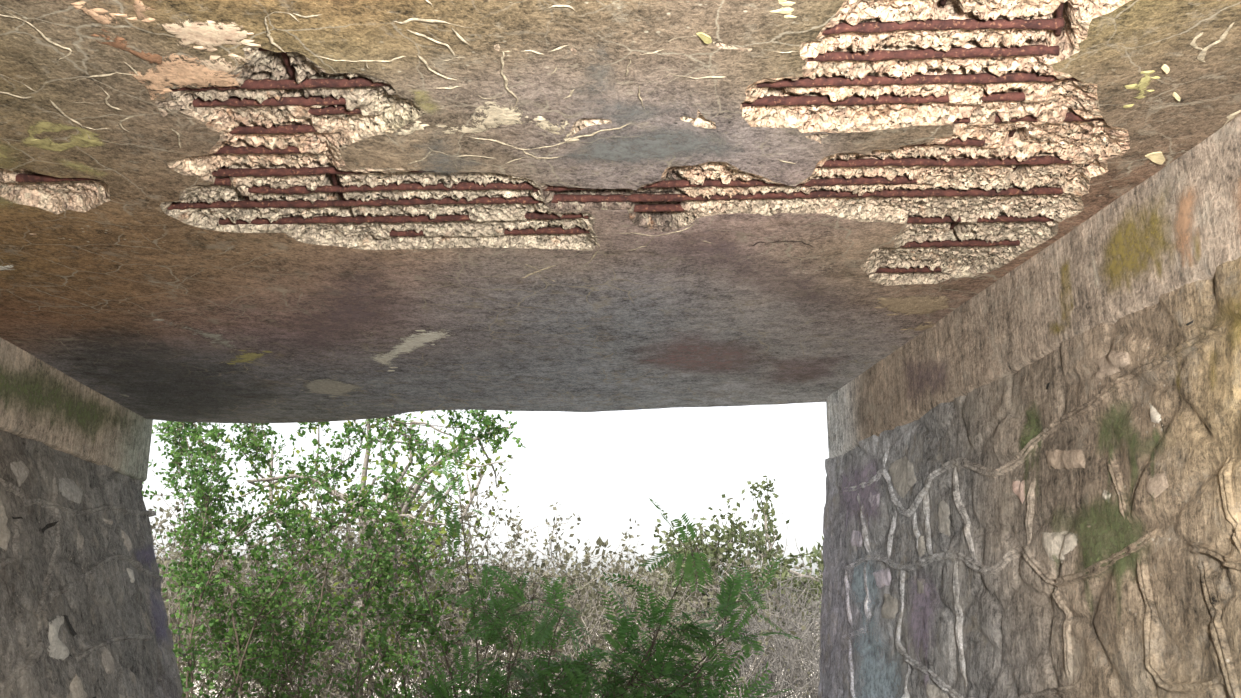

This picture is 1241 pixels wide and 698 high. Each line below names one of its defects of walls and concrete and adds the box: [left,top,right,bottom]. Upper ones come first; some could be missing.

crack [0,13,139,139]
crack [264,12,318,53]
crack [317,0,575,108]
crack [406,36,724,168]
peeling [1123,64,1170,108]
crack [1190,22,1235,62]
crack [1217,110,1241,130]
spalling [71,0,1131,331]
peeling [1145,152,1165,164]
spalling [0,168,110,214]